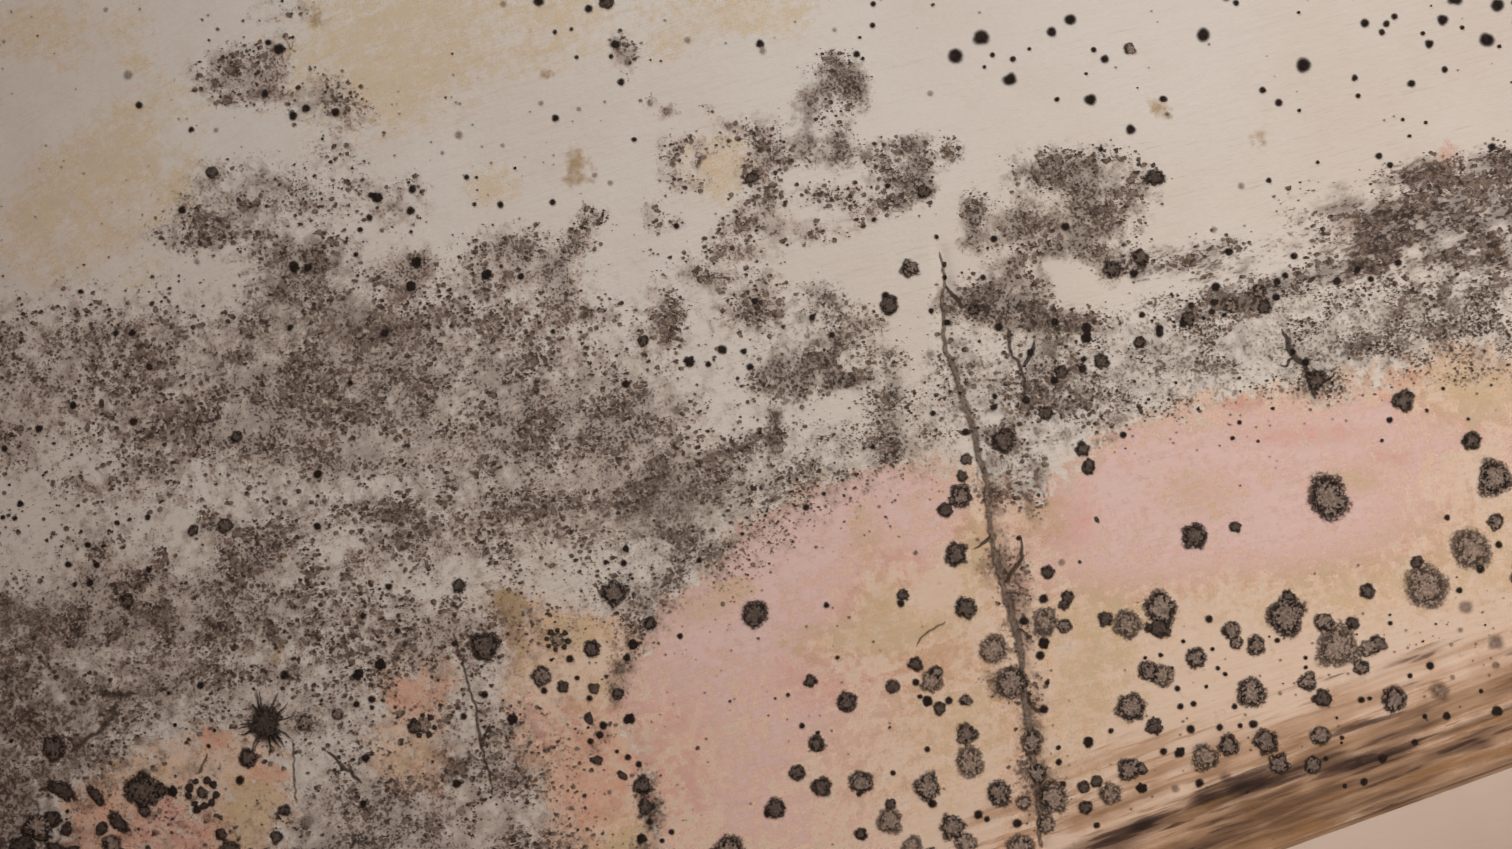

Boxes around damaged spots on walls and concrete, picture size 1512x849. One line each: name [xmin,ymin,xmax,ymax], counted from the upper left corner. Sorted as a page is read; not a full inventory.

damp [585,0,615,12]
damp [949,12,1031,85]
damp [1047,14,1076,36]
damp [1091,42,1137,68]
damp [1198,28,1210,45]
damp [1297,58,1311,72]
damp [1361,13,1398,35]
damp [1421,0,1465,48]
damp [1480,33,1502,64]
damp [191,33,377,128]
damp [899,258,920,278]
crack [940,253,1043,848]